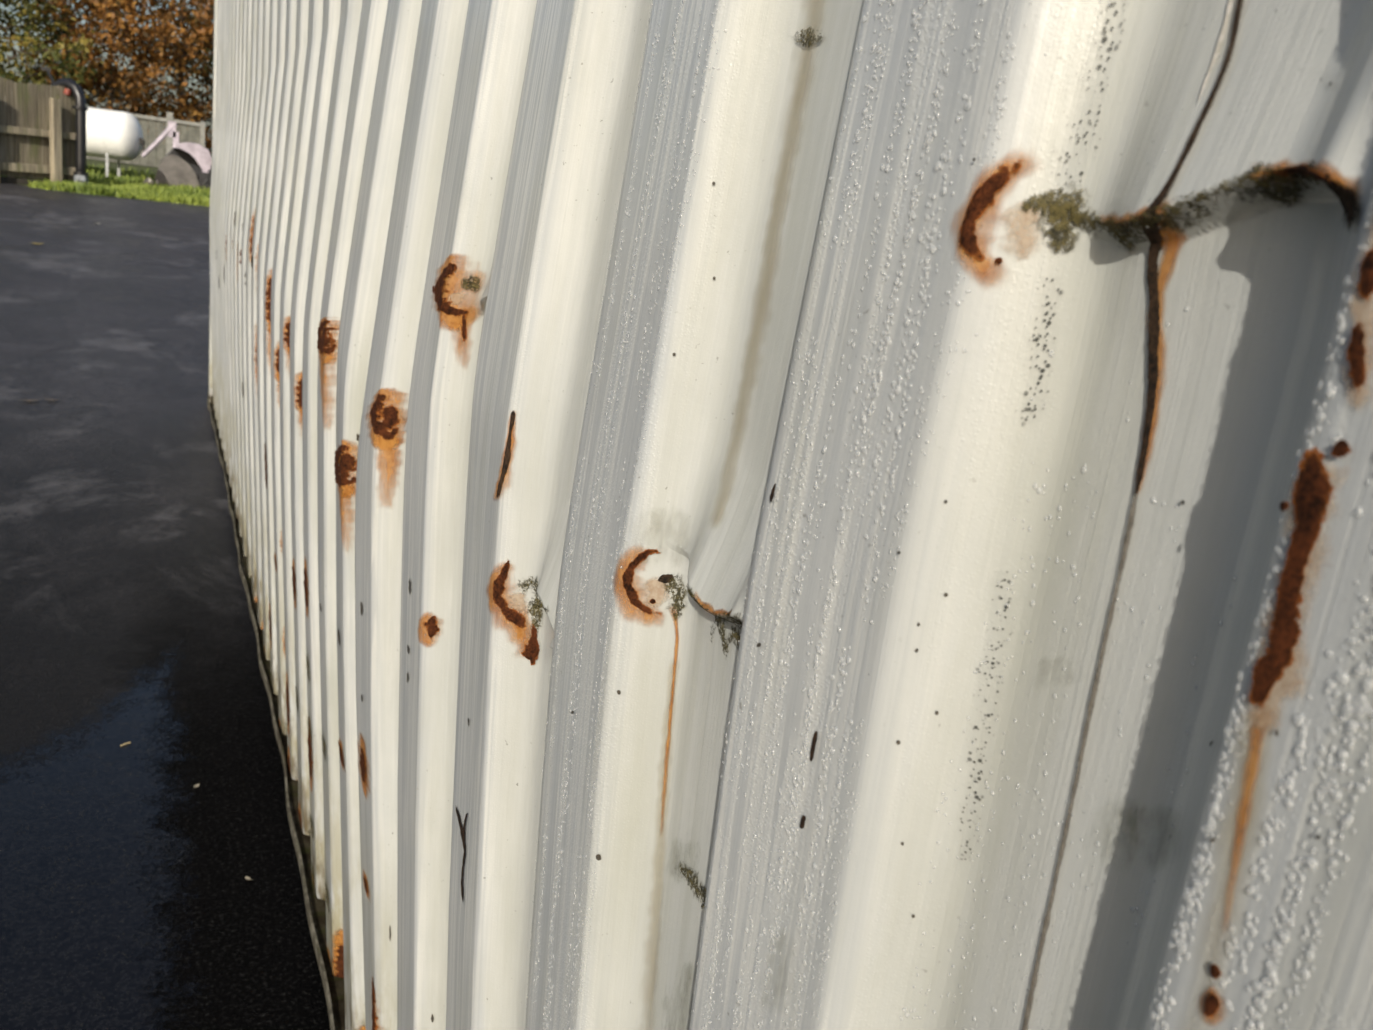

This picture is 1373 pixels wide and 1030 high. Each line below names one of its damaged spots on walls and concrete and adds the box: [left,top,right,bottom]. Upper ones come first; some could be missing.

rust [958,159,1037,280]
rust [317,317,339,415]
rust [431,254,480,354]
rust [1346,238,1373,406]
rust [334,389,407,536]
crack [1022,0,1244,1030]
rust [487,561,540,665]
rust [615,549,679,816]
rust [1232,440,1352,878]